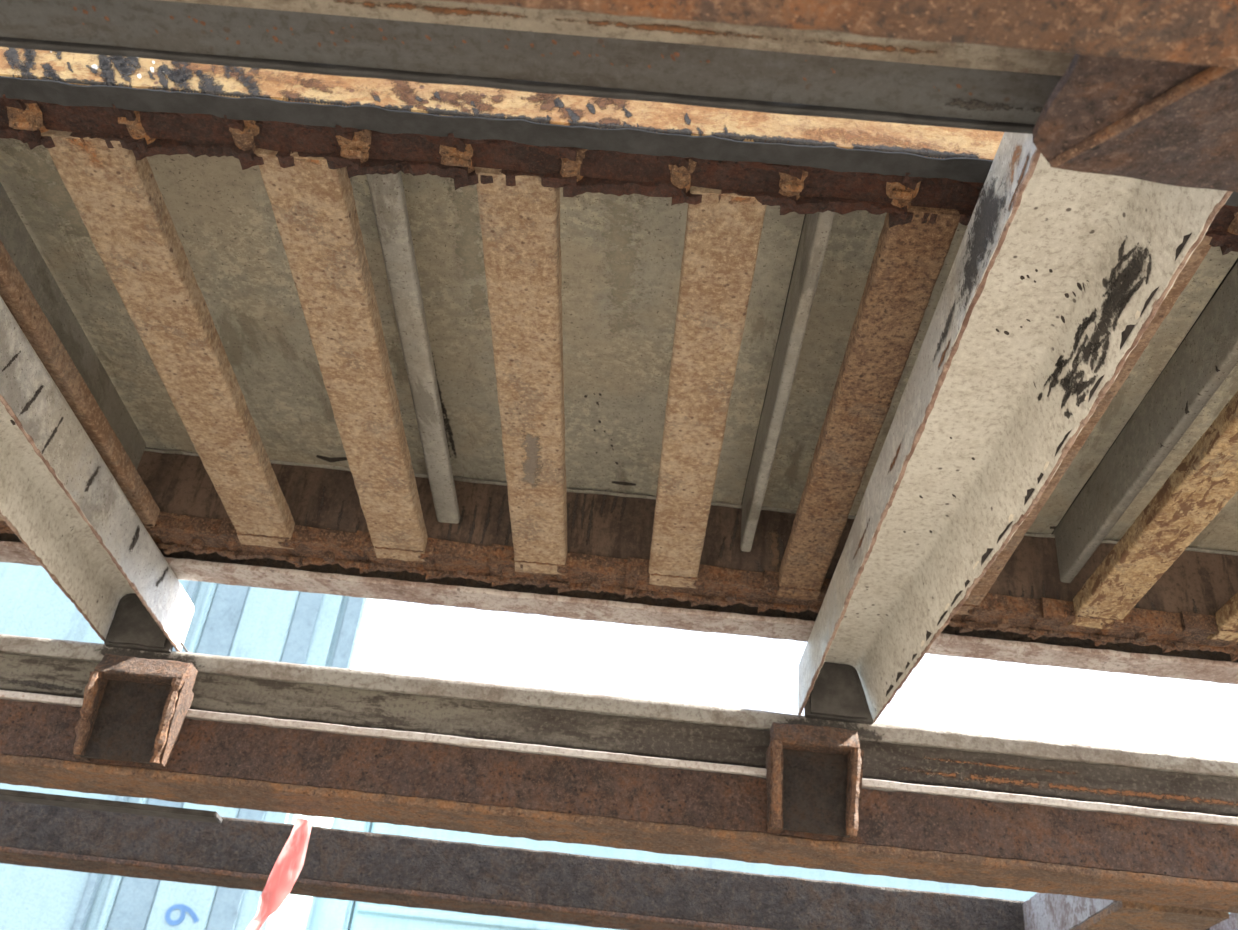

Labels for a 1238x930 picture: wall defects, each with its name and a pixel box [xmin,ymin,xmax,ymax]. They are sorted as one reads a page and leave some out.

rust [334,0,528,19]
rust [556,19,783,40]
rust [806,40,937,54]
peeling [4,47,262,98]
peeling [281,78,333,103]
peeling [371,79,503,115]
peeling [521,93,639,129]
rust [1175,233,1192,261]
rust [1120,287,1159,350]
rust [1024,473,1044,505]
rust [981,521,1013,566]
rust [926,580,970,641]